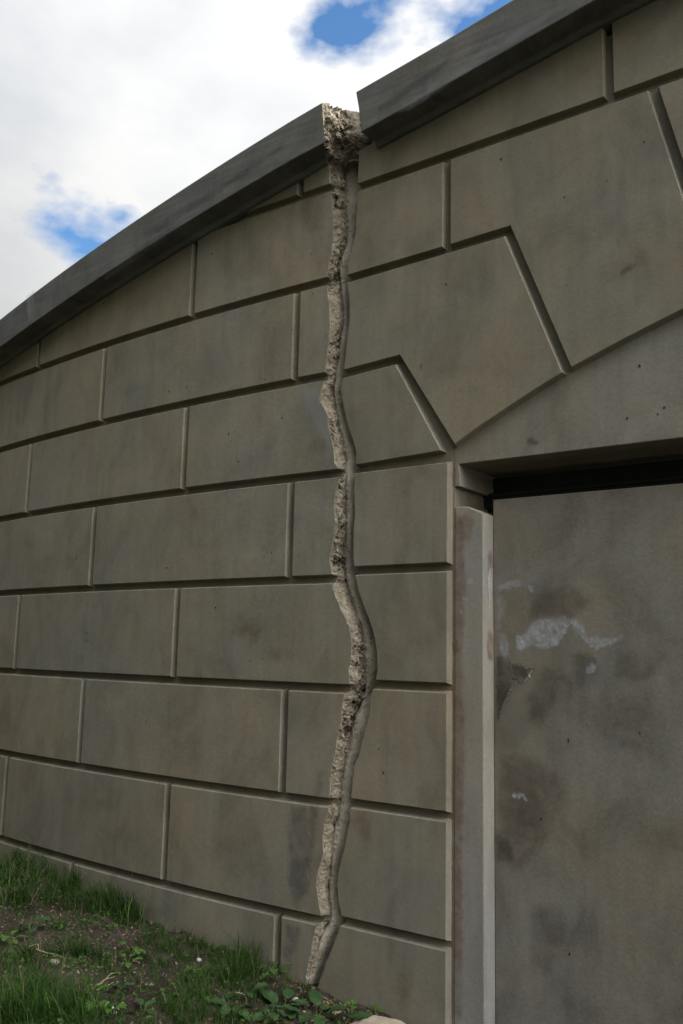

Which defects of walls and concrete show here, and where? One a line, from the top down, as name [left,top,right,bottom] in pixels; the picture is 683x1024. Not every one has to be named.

crack [305,110,379,985]
peeling [497,654,537,717]